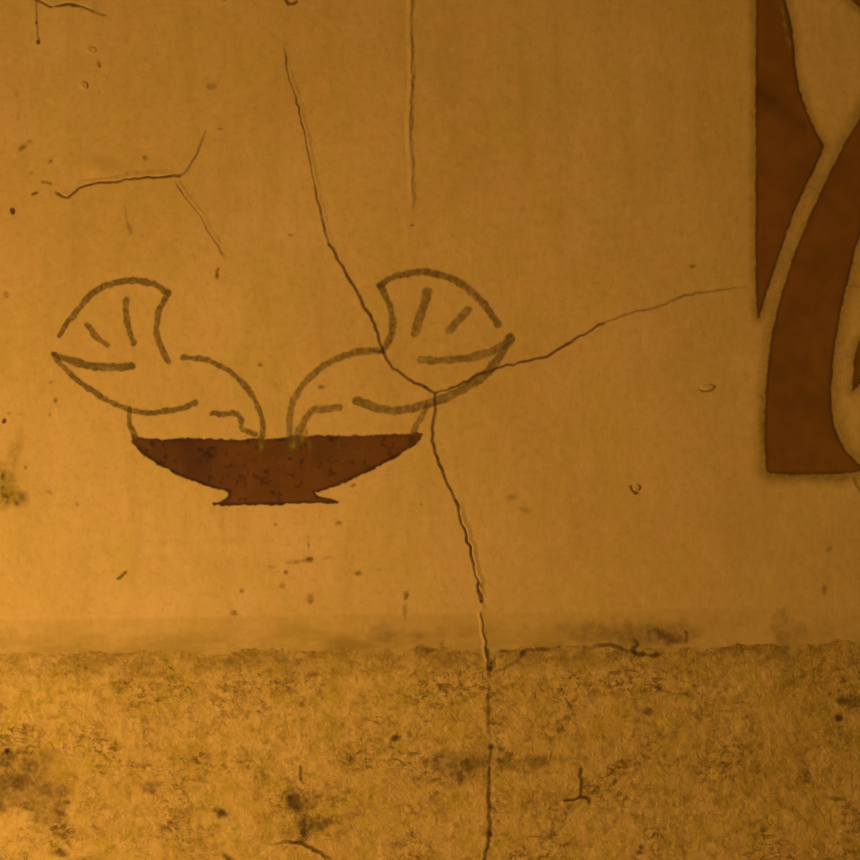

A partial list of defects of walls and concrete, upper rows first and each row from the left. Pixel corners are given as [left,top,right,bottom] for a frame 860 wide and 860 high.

crack [37,0,100,12]
crack [404,0,414,210]
crack [56,168,222,247]
crack [284,46,660,671]
crack [482,745,492,860]
crack [560,768,591,810]